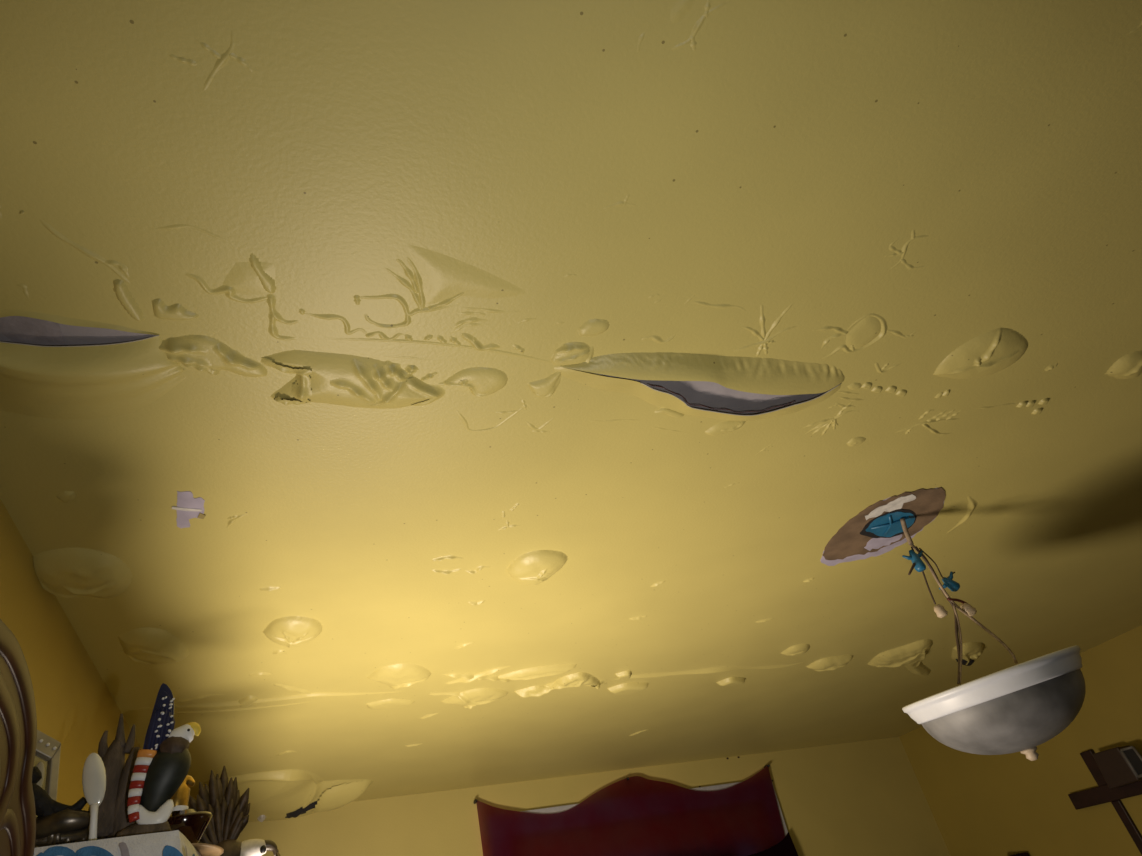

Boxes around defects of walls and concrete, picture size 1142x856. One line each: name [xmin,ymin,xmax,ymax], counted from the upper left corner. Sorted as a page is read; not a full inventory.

peeling [0,310,186,420]
peeling [554,352,845,421]
peeling [172,491,206,528]